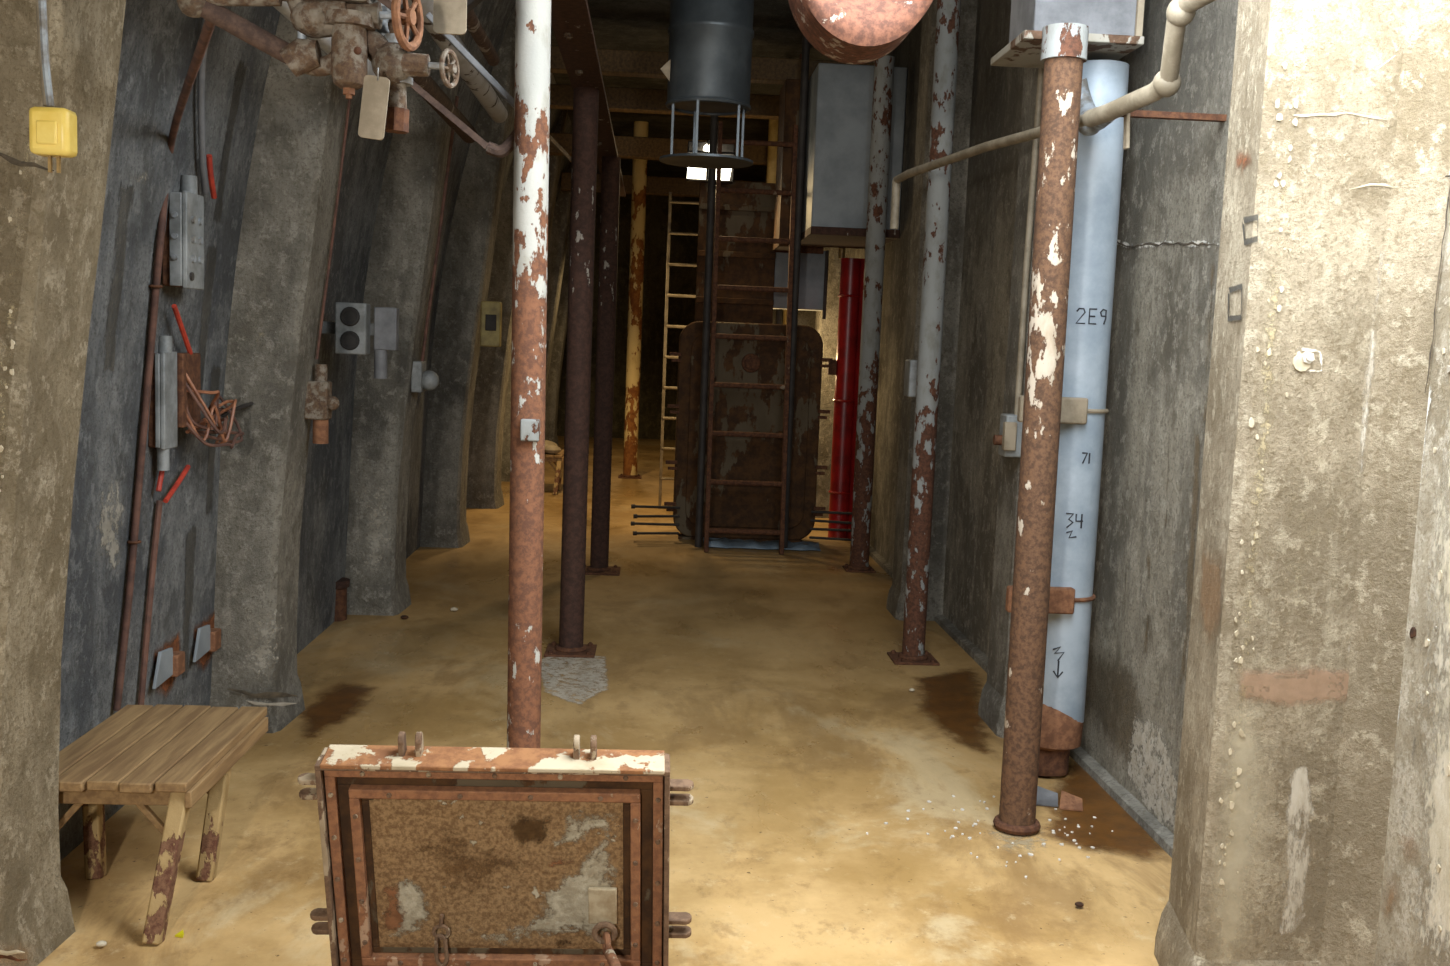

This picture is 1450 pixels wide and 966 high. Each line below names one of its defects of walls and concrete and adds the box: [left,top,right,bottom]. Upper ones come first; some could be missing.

crack [0,153,54,171]
crack [1420,171,1450,481]
water stain [920,671,988,751]
water stain [1281,768,1313,934]